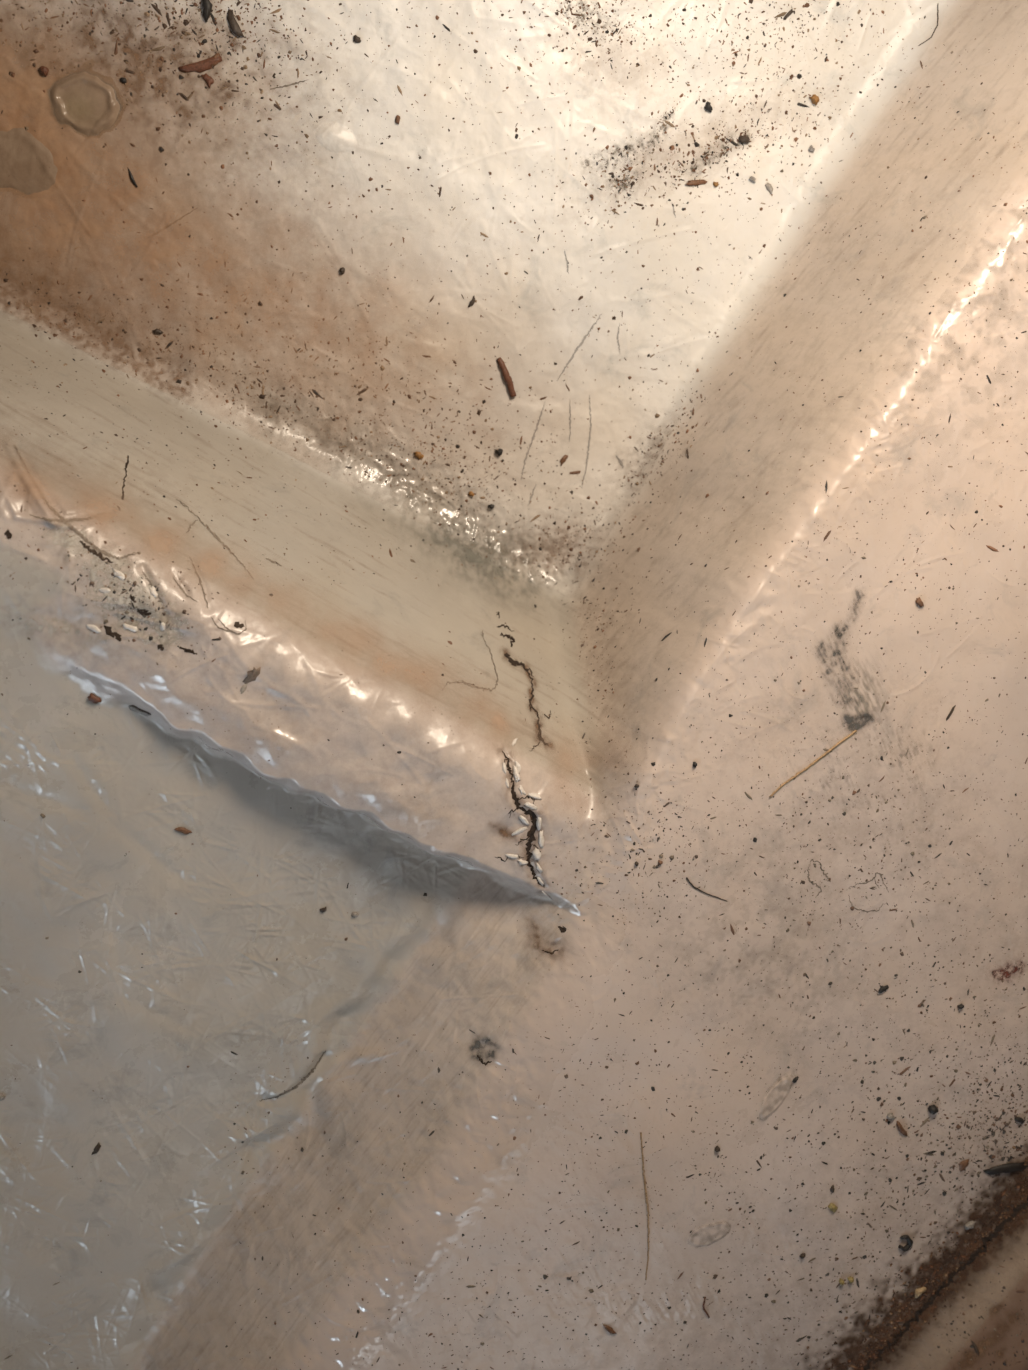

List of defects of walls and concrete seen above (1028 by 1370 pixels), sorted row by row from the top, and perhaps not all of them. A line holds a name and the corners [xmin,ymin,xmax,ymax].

crack [442,612,553,900]